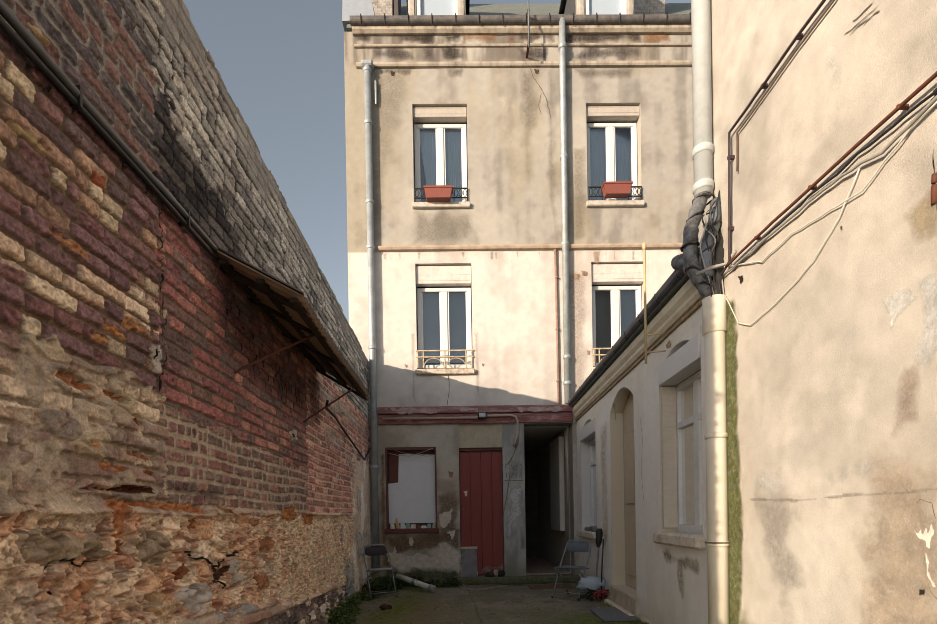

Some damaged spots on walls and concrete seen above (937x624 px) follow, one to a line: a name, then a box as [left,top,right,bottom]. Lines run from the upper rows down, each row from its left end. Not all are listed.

water stain [444,47,459,58]
crack [529,67,552,121]
crack [158,202,168,397]
spalling [89,318,145,345]
crack [184,549,244,589]
peeling [914,524,935,595]